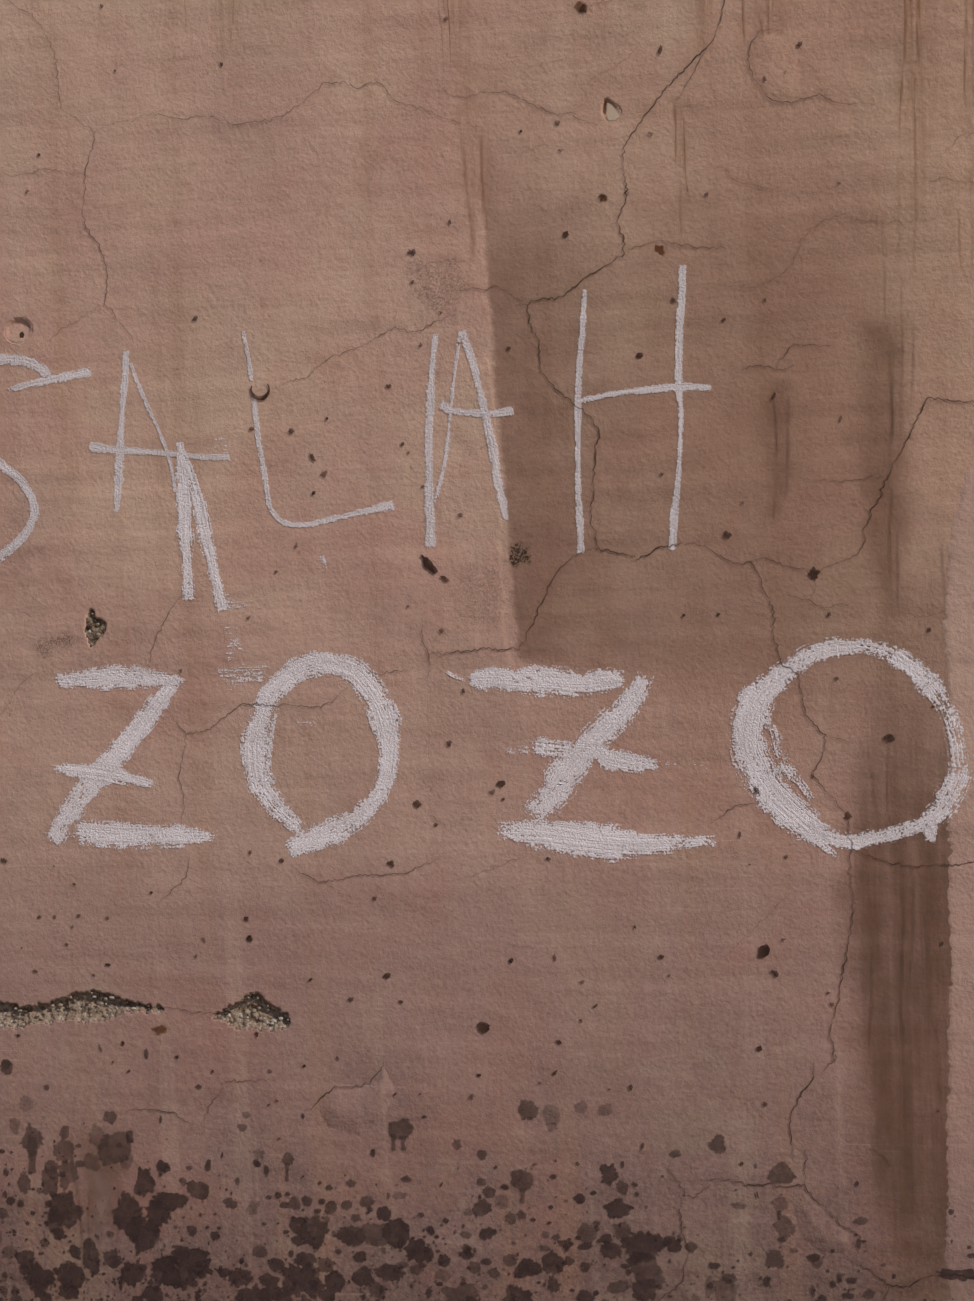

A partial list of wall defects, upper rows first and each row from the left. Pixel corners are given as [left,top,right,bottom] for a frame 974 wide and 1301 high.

crack [291,0,974,868]
crack [176,699,335,825]
crack [295,862,432,890]
flaking render [0,963,164,1037]
flaking render [213,993,293,1037]
leakage [859,791,951,1226]